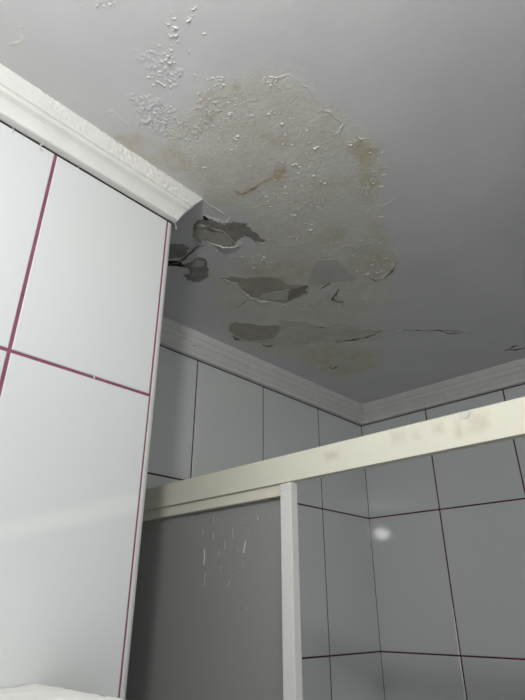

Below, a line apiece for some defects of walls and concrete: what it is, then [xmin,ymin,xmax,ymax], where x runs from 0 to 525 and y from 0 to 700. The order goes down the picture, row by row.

peeling [168,215,270,282]
water stain [108,49,412,385]
peeling [218,258,359,306]
peeling [227,318,387,347]